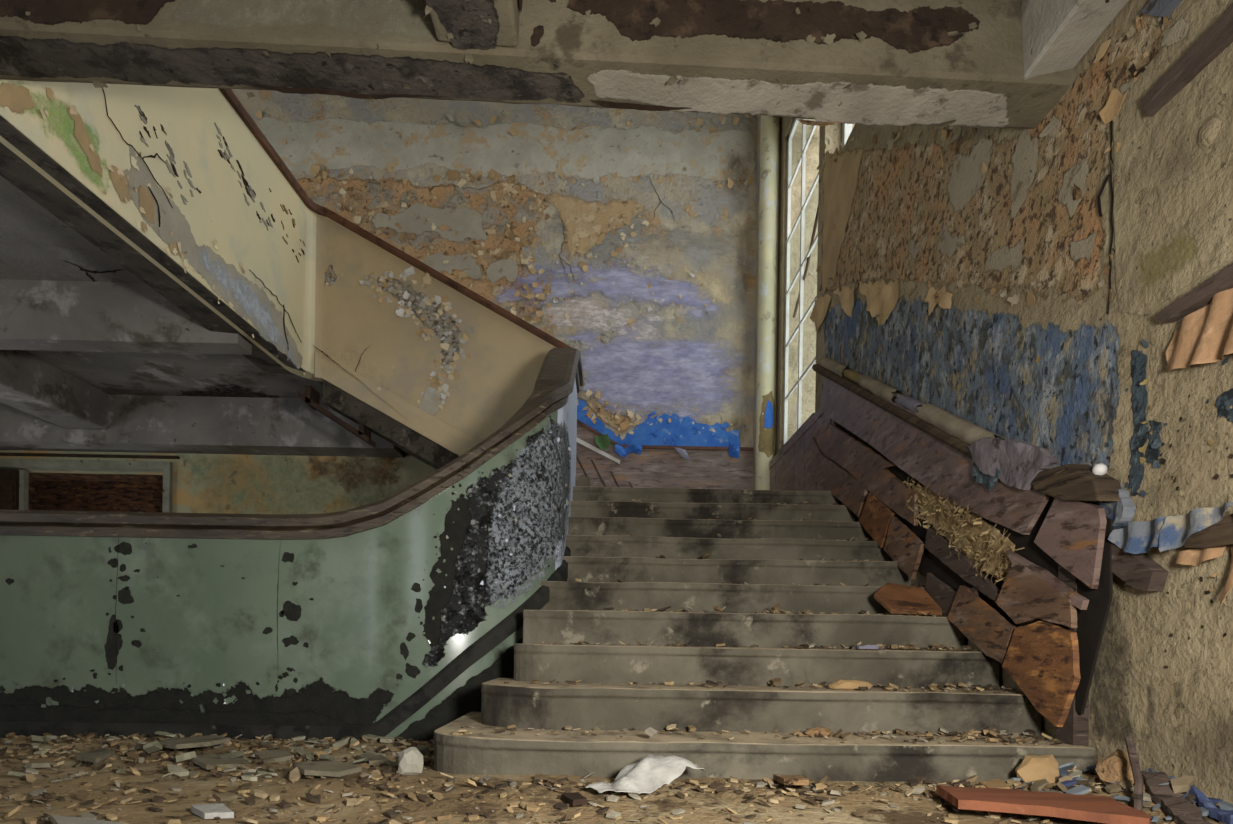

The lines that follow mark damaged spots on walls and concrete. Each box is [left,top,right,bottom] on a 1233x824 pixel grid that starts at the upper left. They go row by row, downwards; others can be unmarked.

crack [102,89,173,227]
spalling [0,0,1191,530]
peeling [1206,386,1233,458]
spalling [282,552,294,563]
spalling [93,542,159,676]
spalling [263,598,314,648]
spalling [411,583,423,613]
leakage [0,668,402,726]
spalling [275,667,298,698]
spalling [396,632,420,680]
leakage [394,638,523,741]